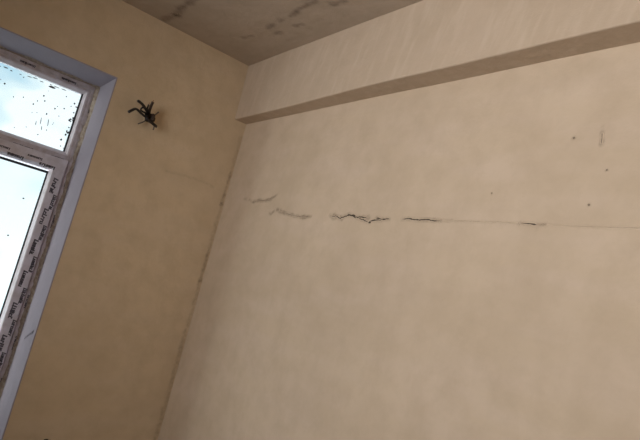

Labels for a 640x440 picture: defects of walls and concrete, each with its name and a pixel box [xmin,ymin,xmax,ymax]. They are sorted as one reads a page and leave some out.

crack [258,195,311,218]
crack [330,213,640,230]